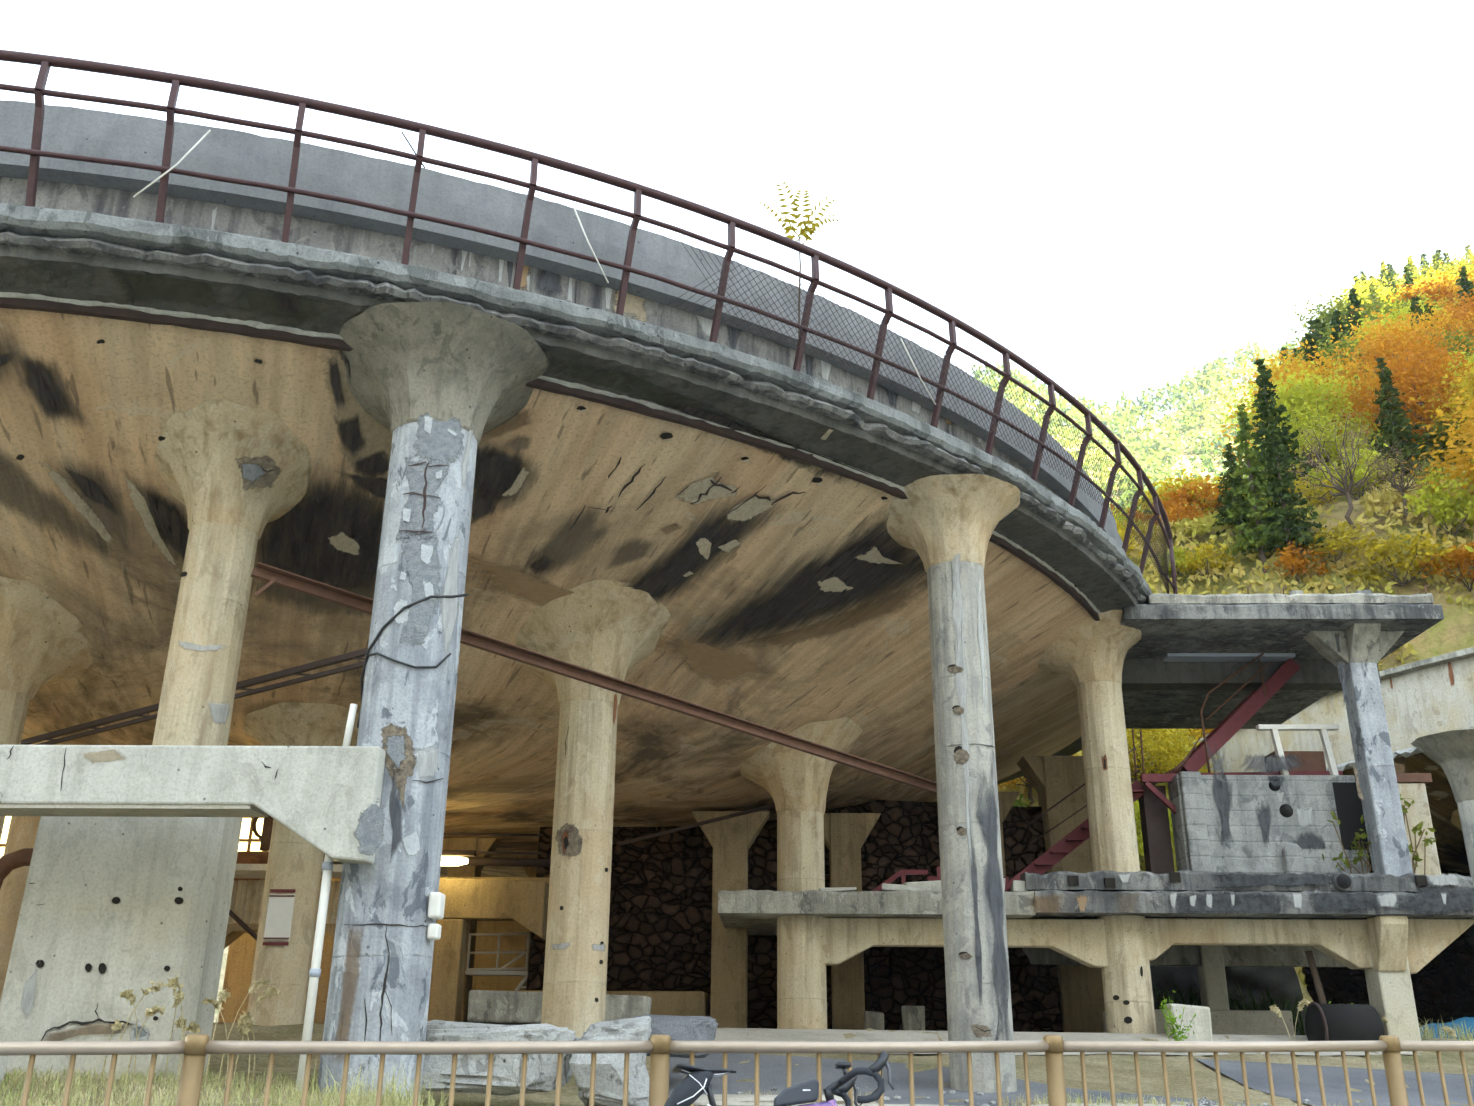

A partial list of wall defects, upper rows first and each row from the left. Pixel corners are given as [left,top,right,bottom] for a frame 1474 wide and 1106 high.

water stain [0,343,82,421]
spalling [235,455,281,491]
water stain [255,474,388,613]
peeling [325,350,464,646]
water stain [628,508,770,603]
spalling [675,476,823,521]
water stain [697,519,928,647]
spalling [555,823,583,858]
water stain [1208,750,1231,841]
water stain [1242,754,1325,849]
crack [41,1004,150,1041]